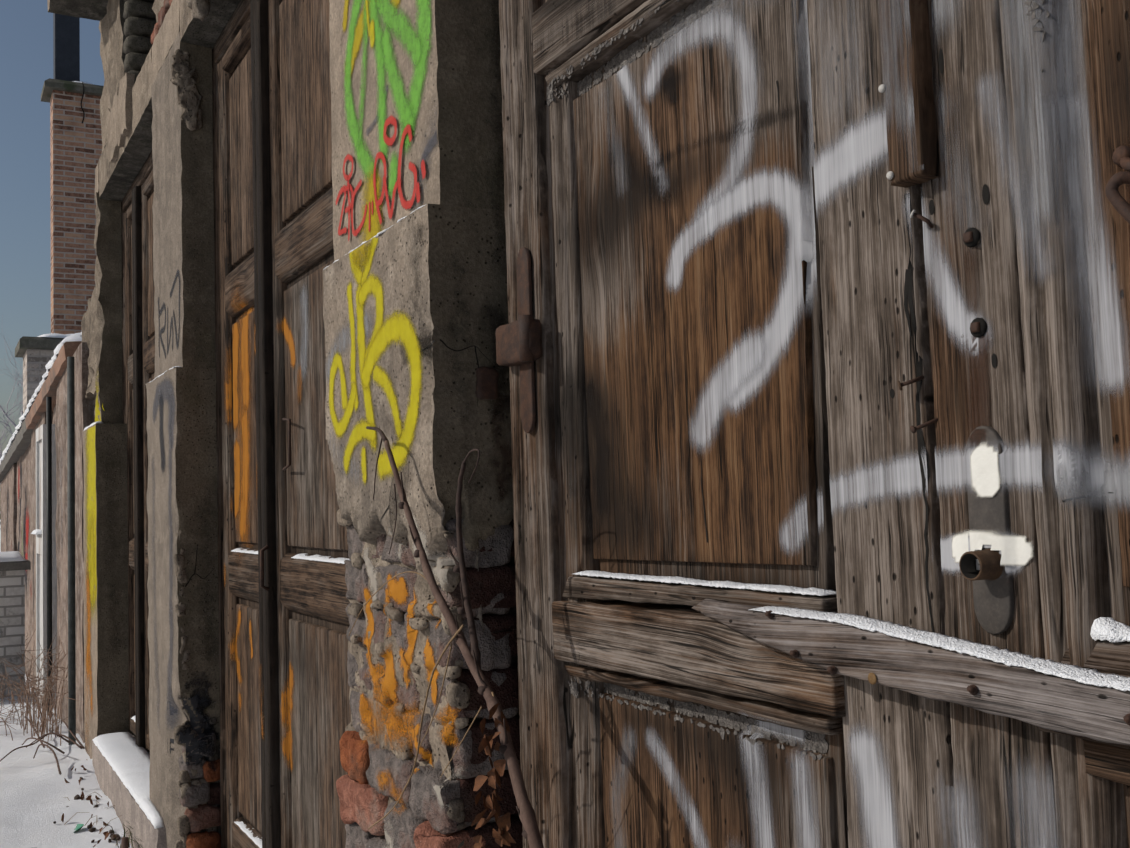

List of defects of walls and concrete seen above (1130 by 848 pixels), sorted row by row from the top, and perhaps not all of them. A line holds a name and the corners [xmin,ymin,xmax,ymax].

flaking render [336,509,523,848]